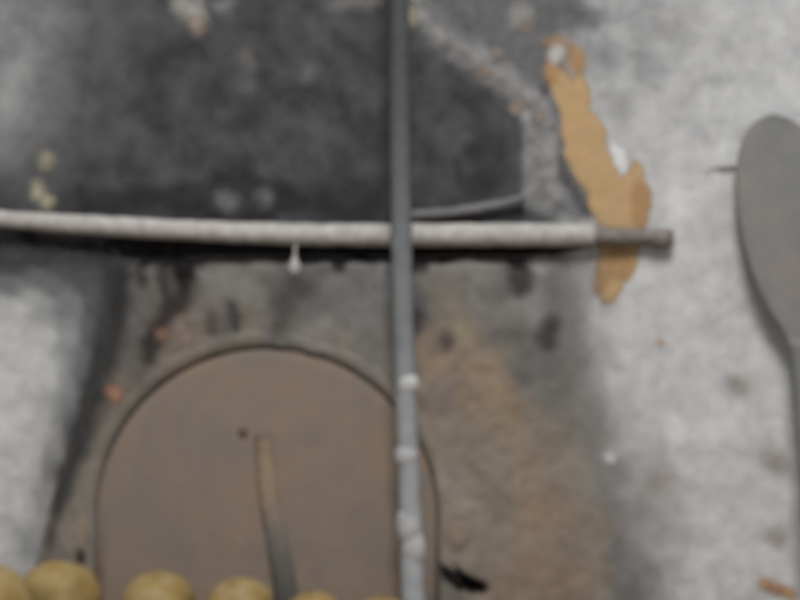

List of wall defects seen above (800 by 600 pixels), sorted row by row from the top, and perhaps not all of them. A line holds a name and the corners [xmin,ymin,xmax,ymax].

peeling [546,39,652,229]
damp [87,185,214,216]
damp [247,185,378,220]
peeling [594,245,639,304]